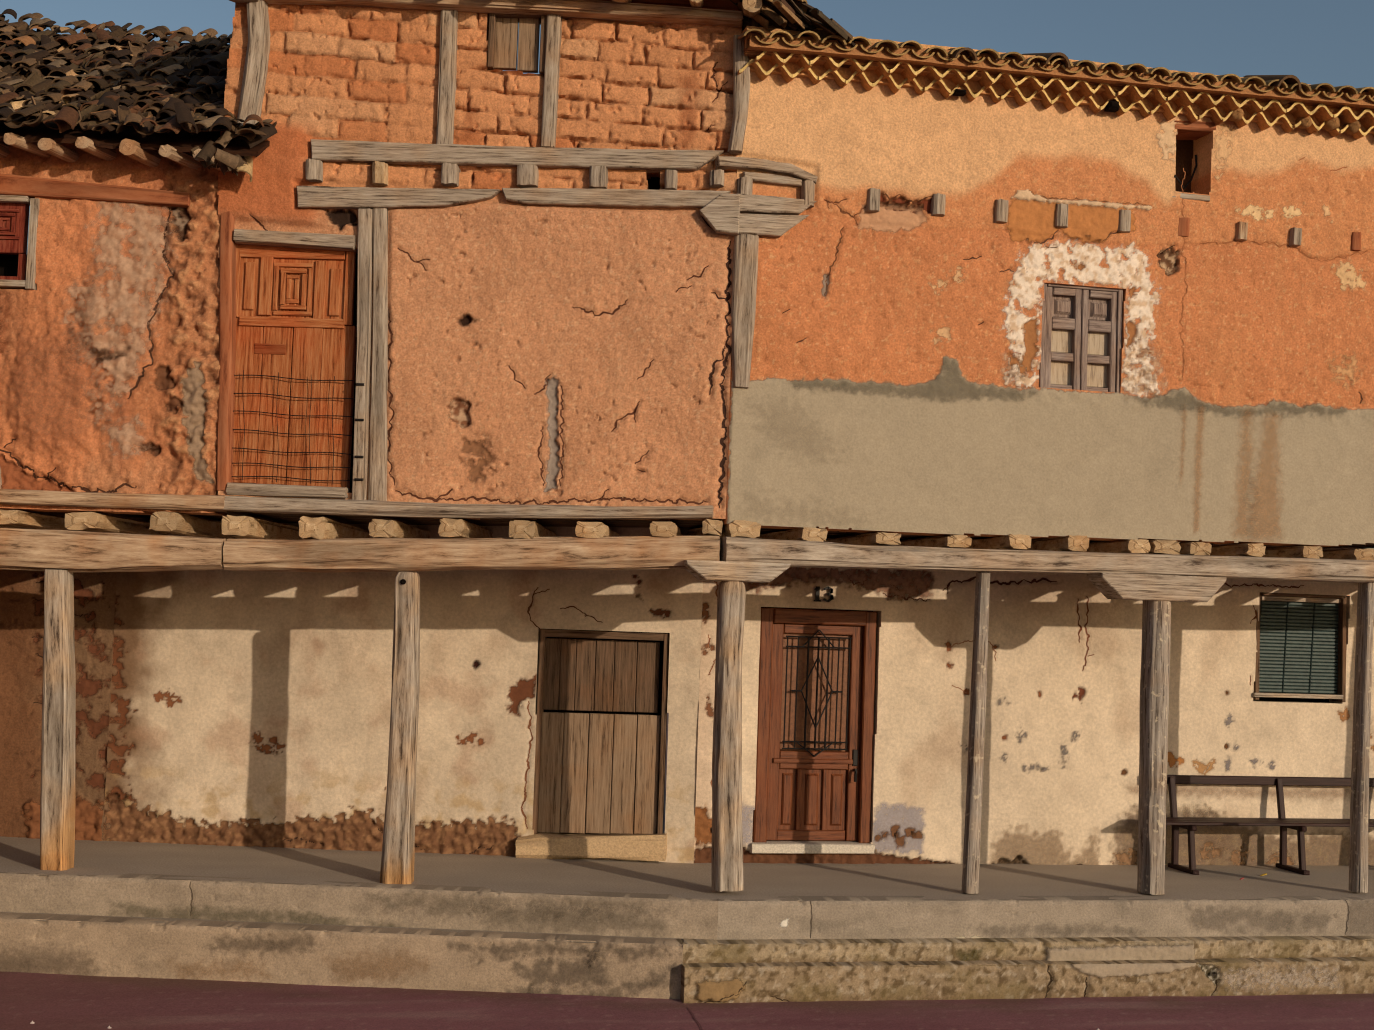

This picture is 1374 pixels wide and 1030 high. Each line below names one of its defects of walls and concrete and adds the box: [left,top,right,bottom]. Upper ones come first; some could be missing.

peeling [64,201,191,459]
crack [387,217,732,508]
peeling [1002,238,1167,401]
crack [1029,168,1368,378]
crack [0,439,137,493]
spalling [743,567,934,601]
crack [847,575,1094,671]
crack [1224,583,1304,624]
spalling [74,579,384,851]
spalling [507,674,537,716]
spalling [415,816,521,856]
spalling [743,825,955,864]